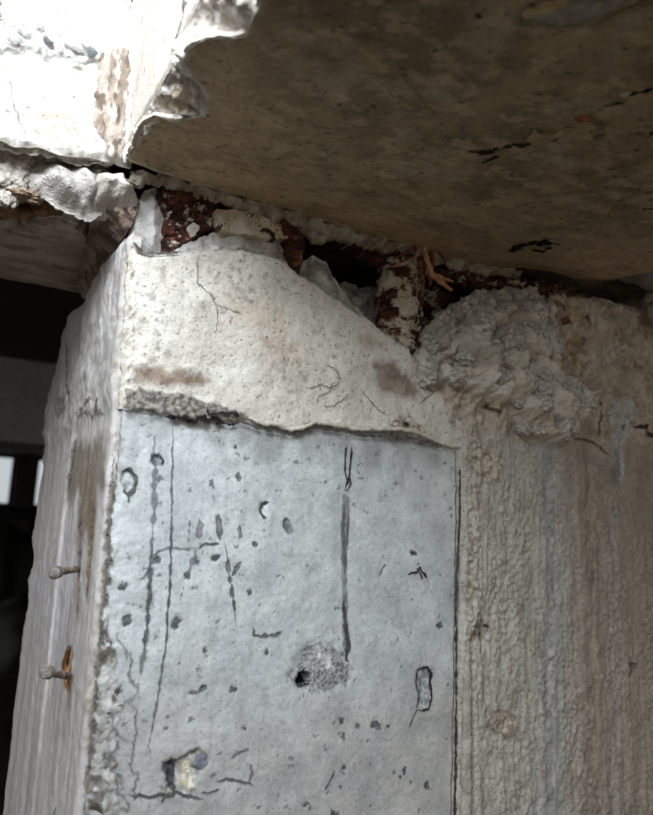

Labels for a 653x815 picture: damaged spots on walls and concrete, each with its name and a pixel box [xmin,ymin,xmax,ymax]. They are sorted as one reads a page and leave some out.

spalling [0,0,261,299]
crack [468,127,573,164]
rust [335,241,390,268]
crack [133,242,240,333]
rust [412,261,602,376]
damp [136,367,205,385]
spalling [124,386,245,421]
spalling [390,415,425,432]
crack [573,401,609,455]
crack [632,424,653,437]
crack [65,341,473,815]
rust [62,645,73,707]